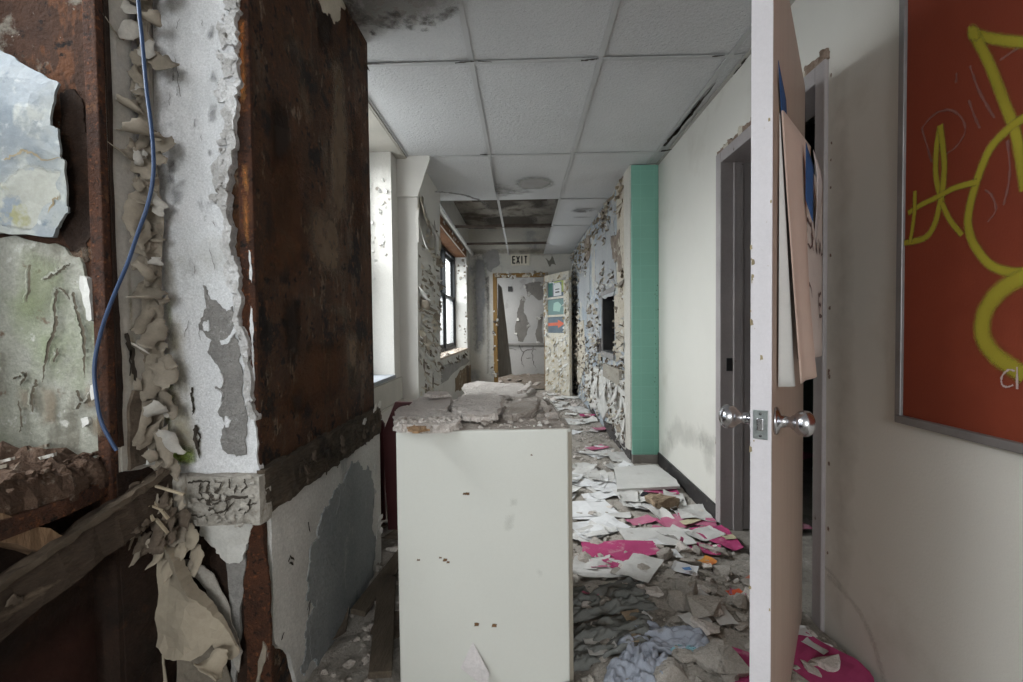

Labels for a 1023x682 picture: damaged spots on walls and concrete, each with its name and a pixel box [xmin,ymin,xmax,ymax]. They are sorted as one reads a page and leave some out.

rust [315,7,332,49]
peeling [318,0,369,70]
water stain [343,0,454,35]
crack [10,263,91,433]
rust [102,0,124,447]
peeling [105,0,262,682]
rust [311,64,348,273]
spalling [415,196,471,396]
water stain [495,178,551,194]
peeling [481,165,632,461]
crack [188,387,256,518]
peeling [300,401,398,676]